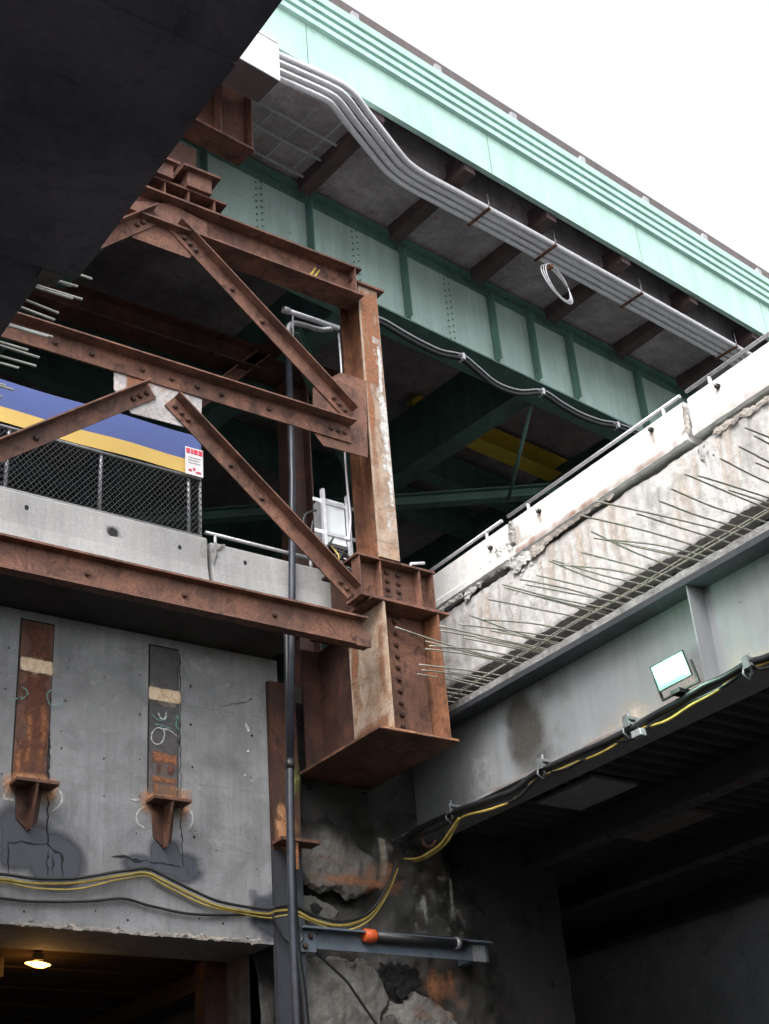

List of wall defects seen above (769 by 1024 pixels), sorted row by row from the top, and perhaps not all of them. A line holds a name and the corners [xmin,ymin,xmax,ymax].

corrosion [360,291,384,461]
spalling [681,402,691,445]
spalling [395,445,769,703]
corrosion [4,626,56,800]
crack [7,734,64,877]
water stain [0,805,83,889]
crack [112,653,189,874]
water stain [123,840,202,883]
corrosion [143,751,188,814]
corrosion [276,805,300,852]
corrosion [358,715,458,741]
spalling [378,959,422,998]